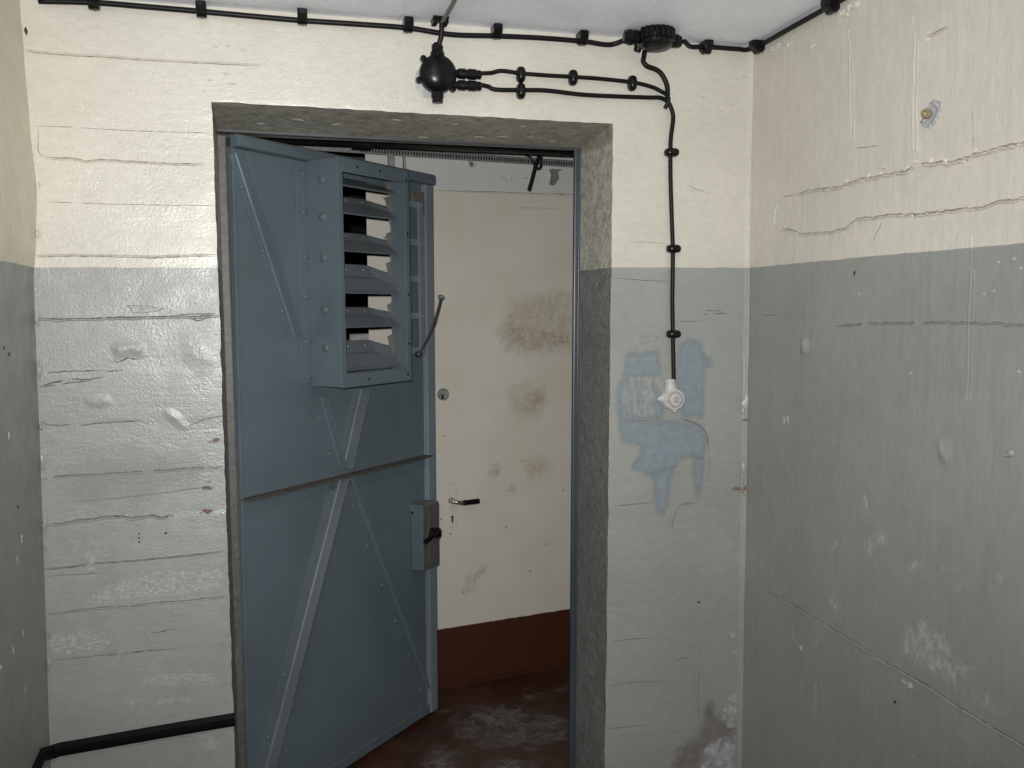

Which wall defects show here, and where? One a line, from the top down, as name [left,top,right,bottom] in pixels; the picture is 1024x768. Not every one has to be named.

crack [773,111,1024,238]
leakage [701,683,737,768]
crack [768,591,1024,748]